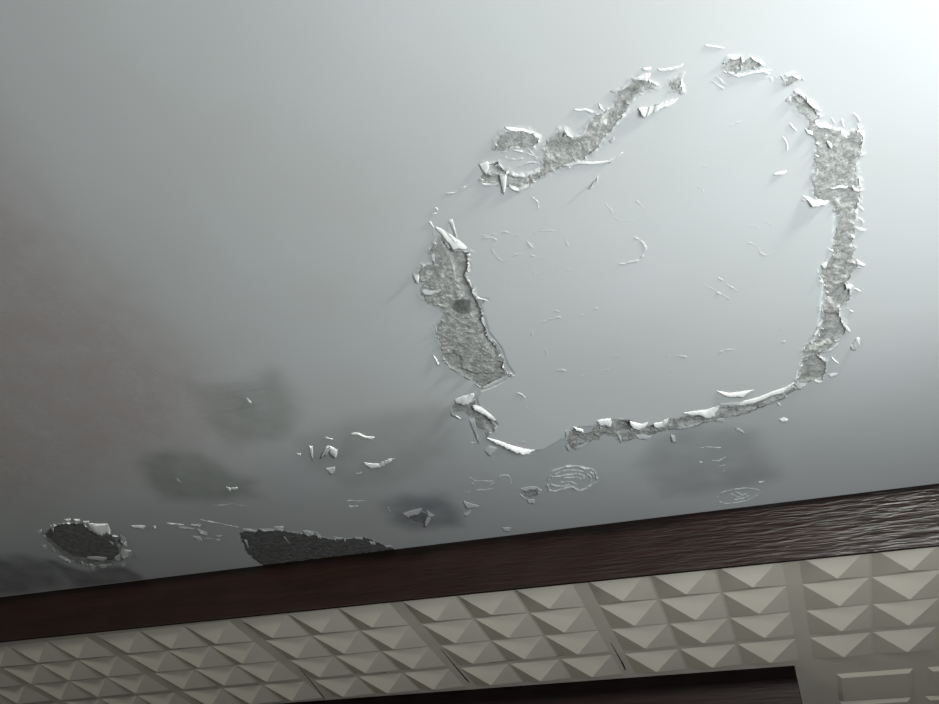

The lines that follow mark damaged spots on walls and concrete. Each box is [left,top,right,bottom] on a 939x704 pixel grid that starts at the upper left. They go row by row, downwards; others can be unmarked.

peeling [469,64,691,197]
flaking render [563,45,871,452]
flaking render [409,219,535,457]
peeling [297,437,338,475]
peeling [356,458,394,475]
peeling [37,519,132,573]
flaking render [235,526,398,566]